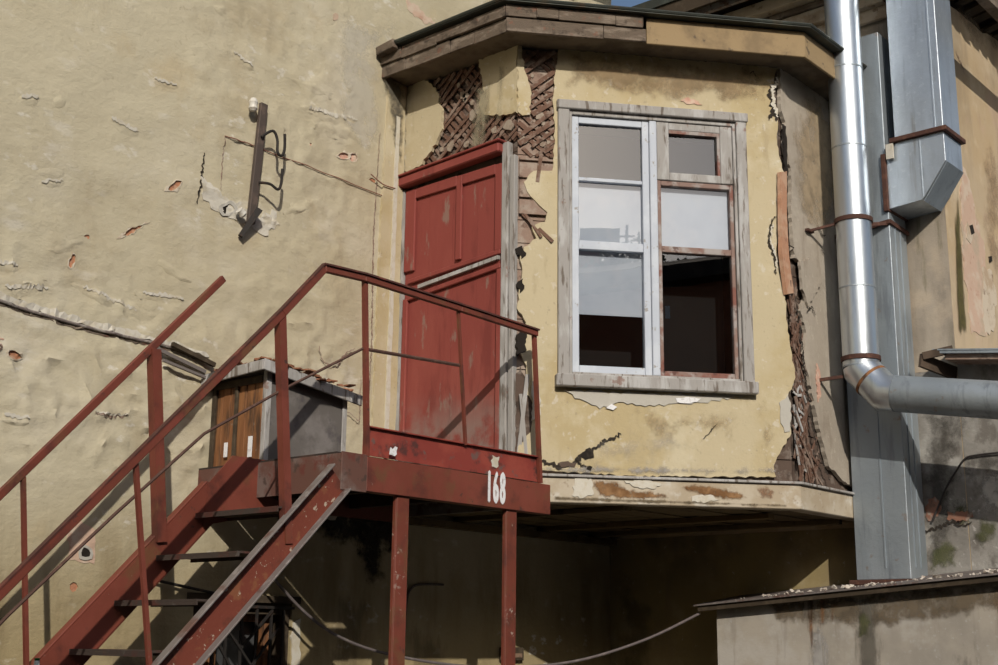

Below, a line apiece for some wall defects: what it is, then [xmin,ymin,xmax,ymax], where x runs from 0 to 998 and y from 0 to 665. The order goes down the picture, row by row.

crack [197,137,250,204]
spalling [200,176,279,236]
spalling [519,153,554,243]
flaking render [777,171,822,307]
peeling [960,166,997,337]
peeling [565,390,744,410]
crack [542,432,621,470]
peeling [685,485,743,503]
leakage [925,417,956,549]
spalling [78,545,93,560]
leakage [772,588,998,665]